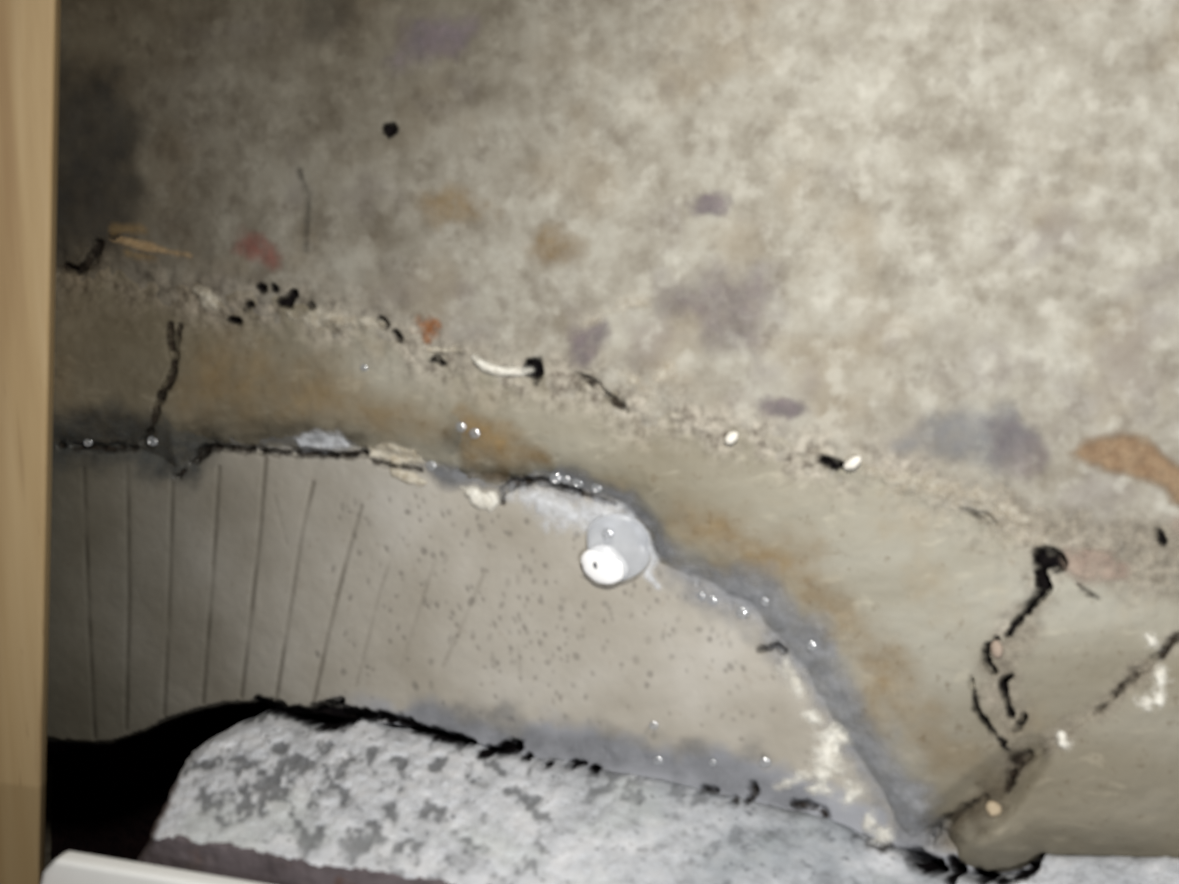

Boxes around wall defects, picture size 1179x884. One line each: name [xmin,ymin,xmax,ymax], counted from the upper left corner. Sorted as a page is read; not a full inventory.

crack [63,241,103,273]
crack [60,322,183,452]
leakage [369,444,499,511]
spalling [820,456,844,471]
leakage [516,469,930,847]
crack [948,547,1094,817]
crack [1115,632,1179,697]
hole [47,702,266,862]